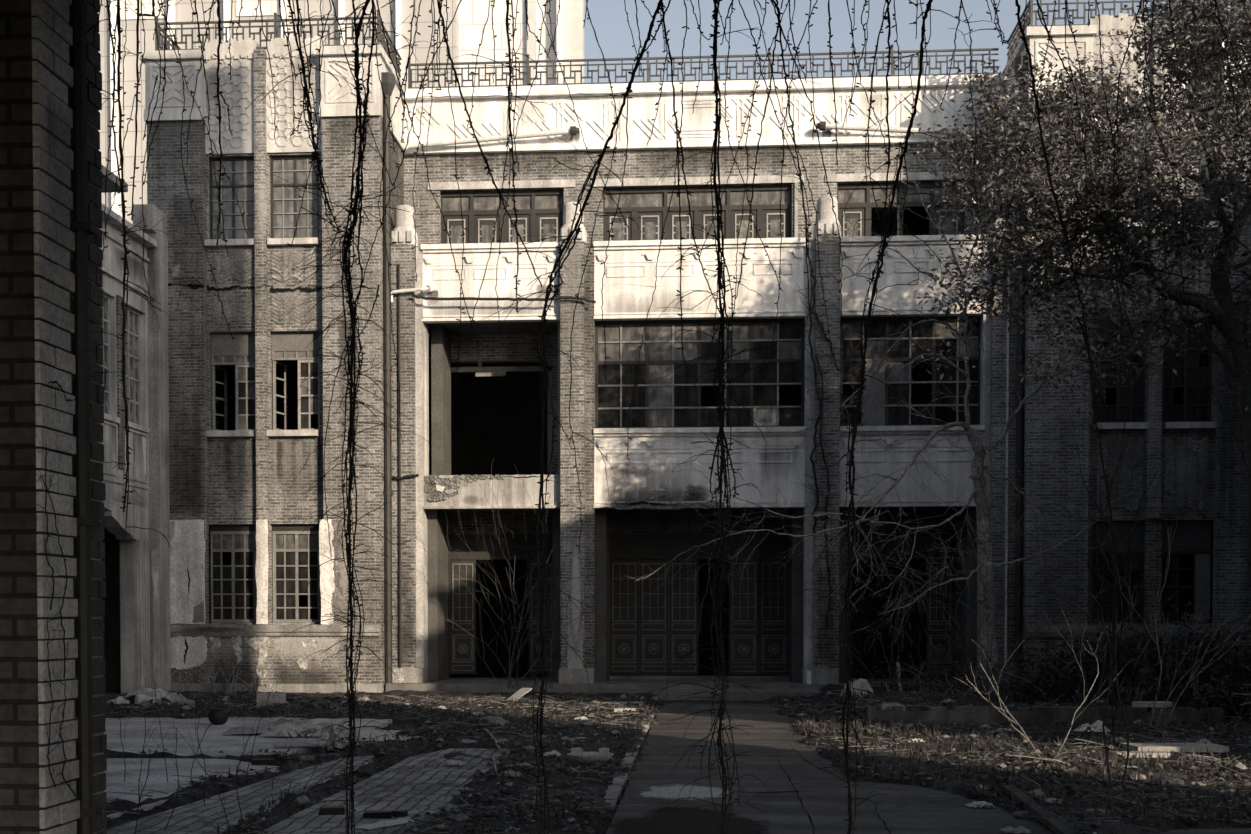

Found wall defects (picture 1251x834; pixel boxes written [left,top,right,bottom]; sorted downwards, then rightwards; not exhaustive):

crack [168,283,376,312]
peeling [170,519,270,684]
damp [272,636,341,666]